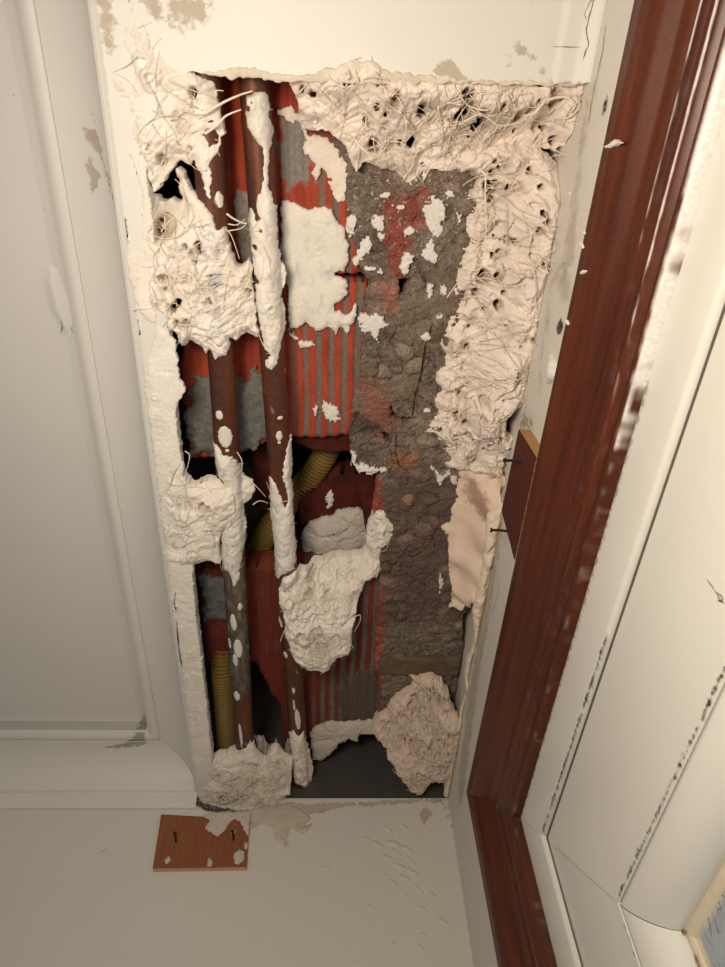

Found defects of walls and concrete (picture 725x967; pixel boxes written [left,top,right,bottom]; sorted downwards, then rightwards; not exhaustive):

flaking render [203,60,586,87]
crack [583,0,606,121]
flaking render [126,152,186,500]
flaking render [165,558,211,802]